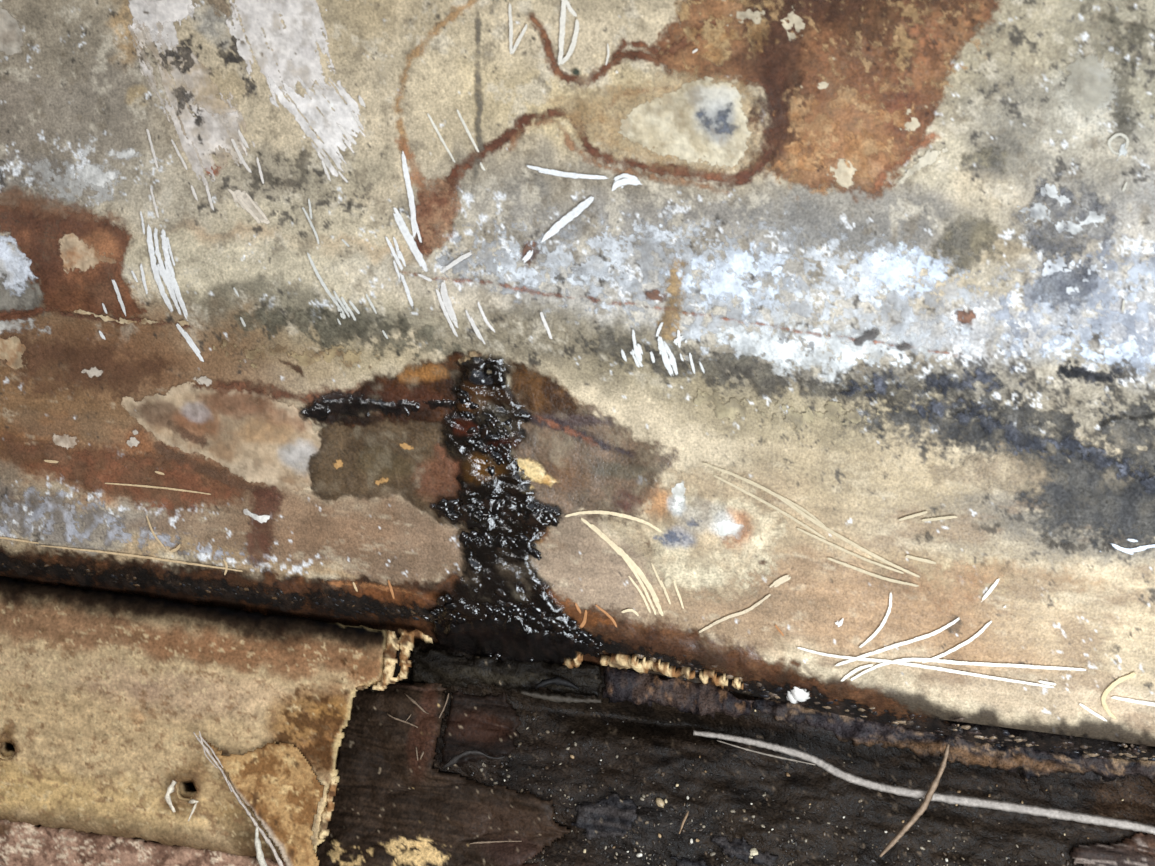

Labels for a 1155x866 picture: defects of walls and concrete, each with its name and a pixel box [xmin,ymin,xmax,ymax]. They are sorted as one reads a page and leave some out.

corrosion [396,0,999,257]
corrosion [0,189,147,325]
corrosion [522,241,539,266]
corrosion [5,335,166,397]
damp [436,173,1155,555]
corrosion [0,433,250,515]
damp [308,416,463,528]